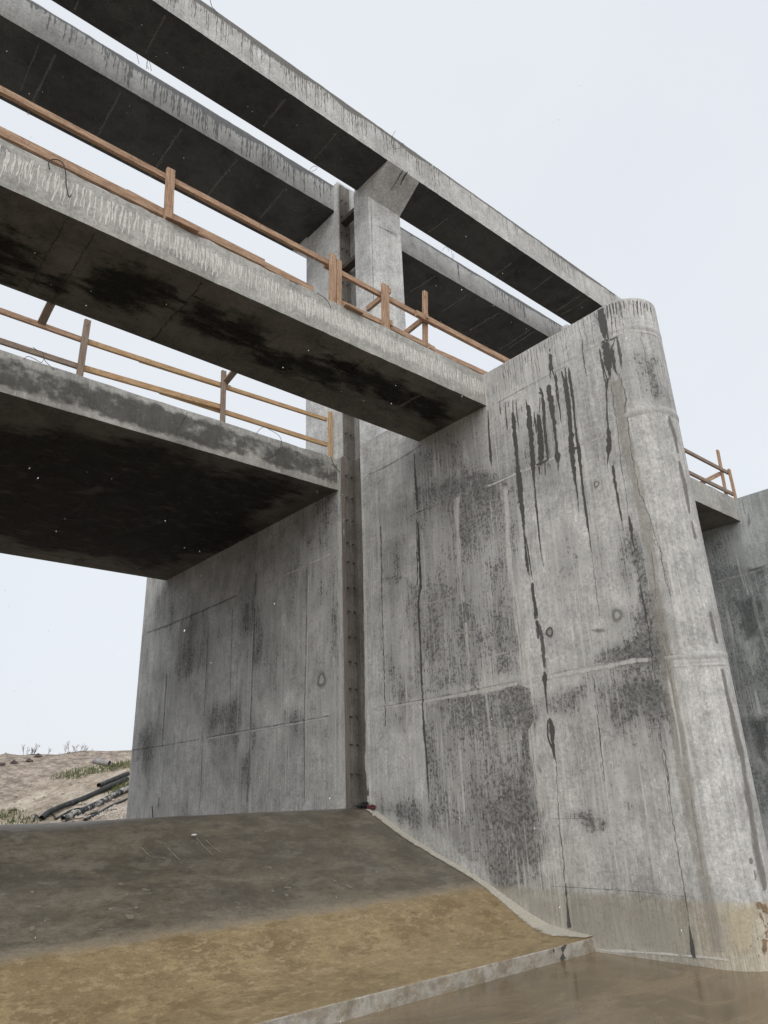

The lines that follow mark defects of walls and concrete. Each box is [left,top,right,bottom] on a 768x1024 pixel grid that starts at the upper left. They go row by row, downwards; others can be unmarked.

water stain [0,0,655,764]
crack [411,453,429,798]
crack [556,769,566,896]
crack [658,719,690,925]